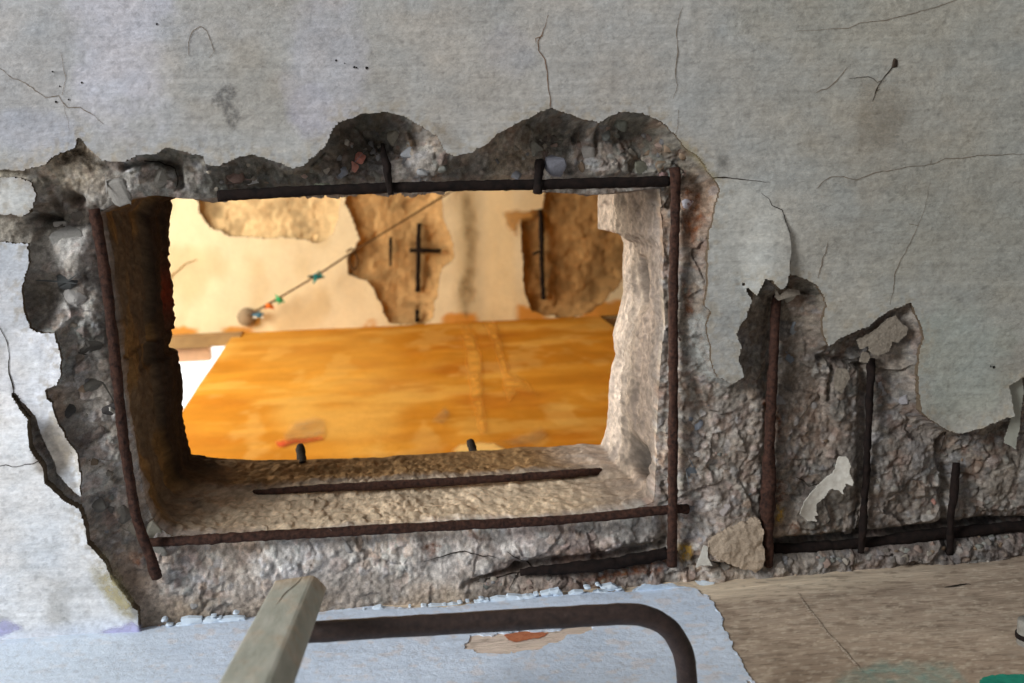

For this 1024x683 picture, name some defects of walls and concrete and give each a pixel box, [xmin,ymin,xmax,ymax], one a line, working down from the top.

crack [800,0,955,31]
crack [1,55,103,130]
crack [535,16,551,108]
crack [816,67,892,102]
crack [713,177,792,277]
crack [816,154,1022,302]
crack [0,328,14,395]
spalling [0,108,1024,628]
crack [424,551,532,590]